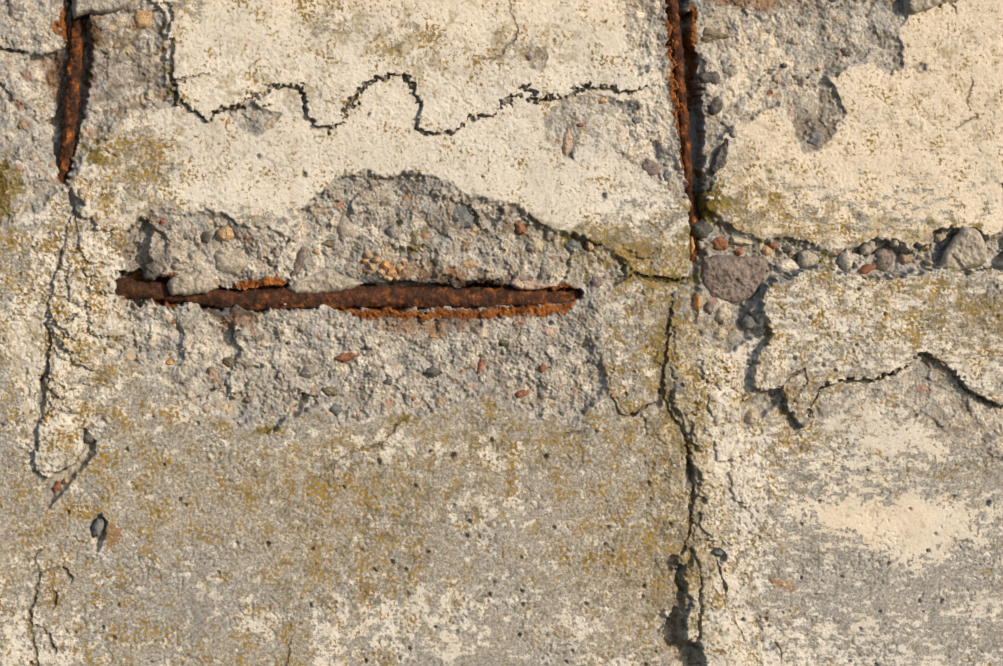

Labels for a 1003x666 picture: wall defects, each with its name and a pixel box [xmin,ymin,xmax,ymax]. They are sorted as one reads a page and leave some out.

rust [53,0,71,47]
crack [169,69,650,137]
rust [665,0,701,190]
crack [954,76,979,131]
flaking render [0,0,1003,465]
rust [233,274,287,290]
rust [338,281,584,323]
crack [609,271,703,556]
crack [784,352,1003,423]
peeling [785,473,1003,577]
crack [697,557,746,643]
peeling [850,613,882,641]